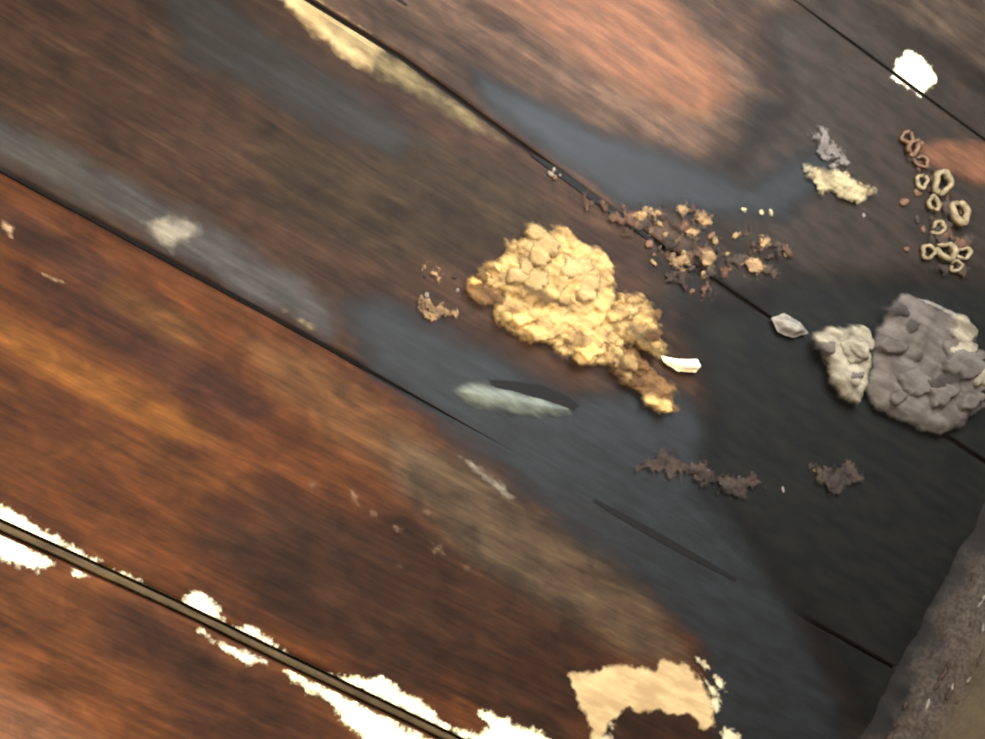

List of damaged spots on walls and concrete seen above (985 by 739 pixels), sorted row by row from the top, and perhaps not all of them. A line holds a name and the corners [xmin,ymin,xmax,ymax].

peeling [285,0,475,123]
peeling [892,51,937,95]
peeling [803,125,877,218]
peeling [899,130,978,277]
spalling [584,190,794,297]
peeling [0,535,52,569]
peeling [0,505,96,561]
peeling [185,592,219,617]
peeling [239,626,278,647]
peeling [283,670,422,739]
peeling [342,675,548,739]
peeling [569,657,723,739]